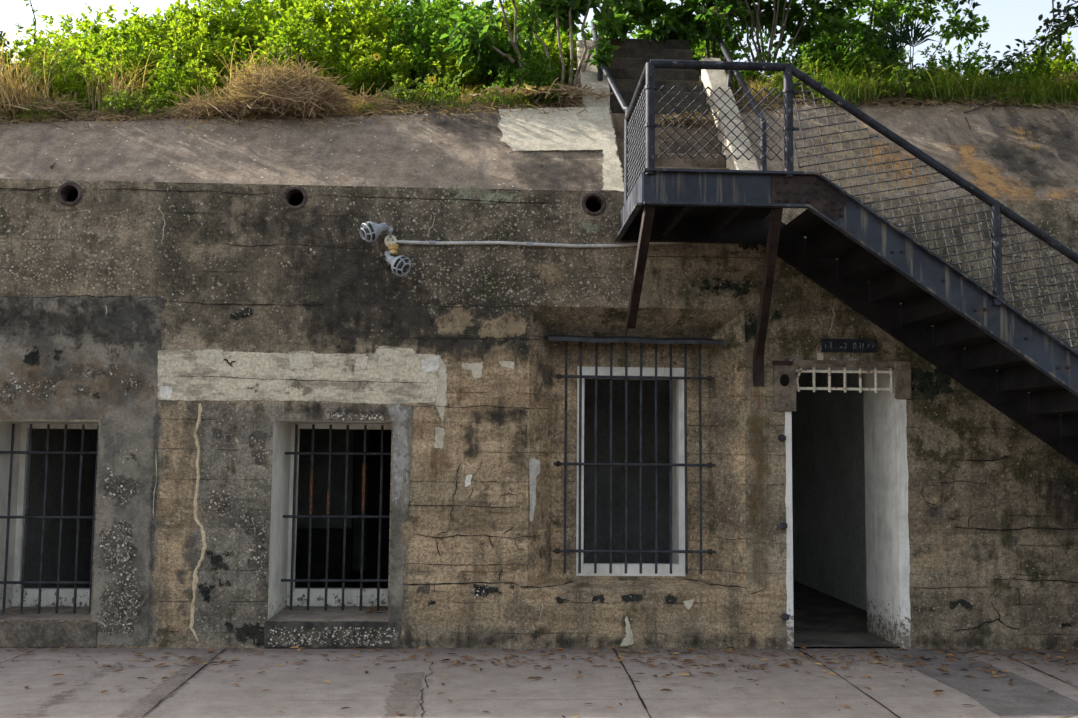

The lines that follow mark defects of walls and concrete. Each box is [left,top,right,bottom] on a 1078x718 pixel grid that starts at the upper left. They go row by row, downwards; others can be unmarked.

crack [0,185,54,193]
crack [121,188,275,245]
damp [0,294,165,353]
crack [0,295,324,306]
damp [234,209,526,361]
peeling [435,304,528,340]
damp [23,346,62,366]
crack [189,359,550,409]
crack [189,403,207,641]
crack [404,462,574,592]
crack [916,578,1078,631]